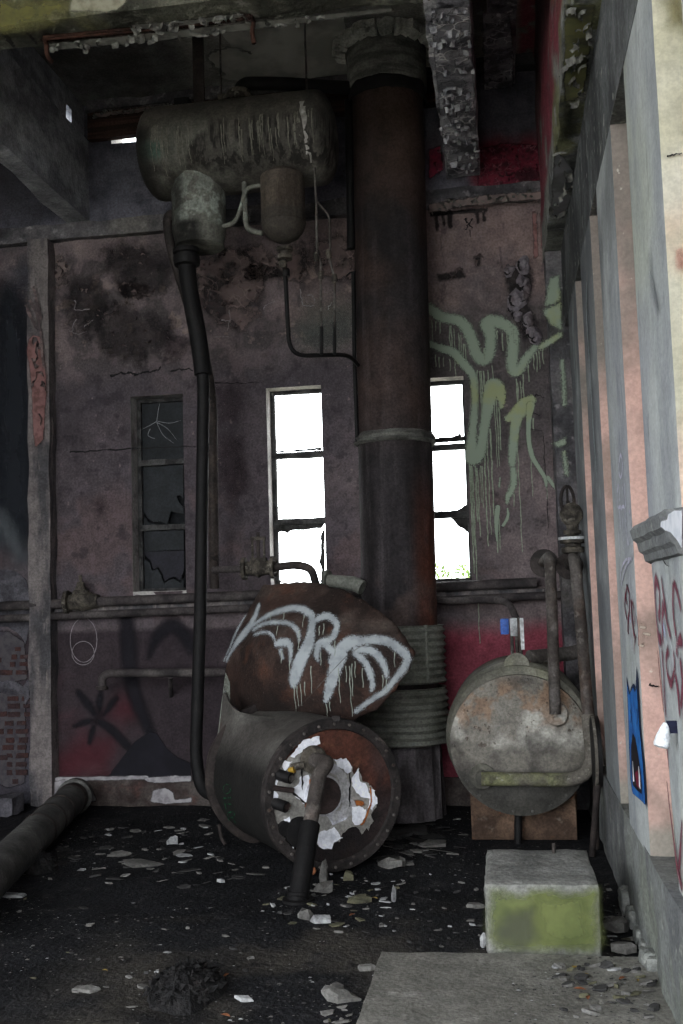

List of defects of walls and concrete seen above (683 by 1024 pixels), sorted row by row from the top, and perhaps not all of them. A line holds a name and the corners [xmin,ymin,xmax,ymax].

flaking render [40,7,574,231]
spalling [558,4,595,108]
peeling [24,286,47,447]
crack [110,366,262,384]
flaking render [0,569,30,788]